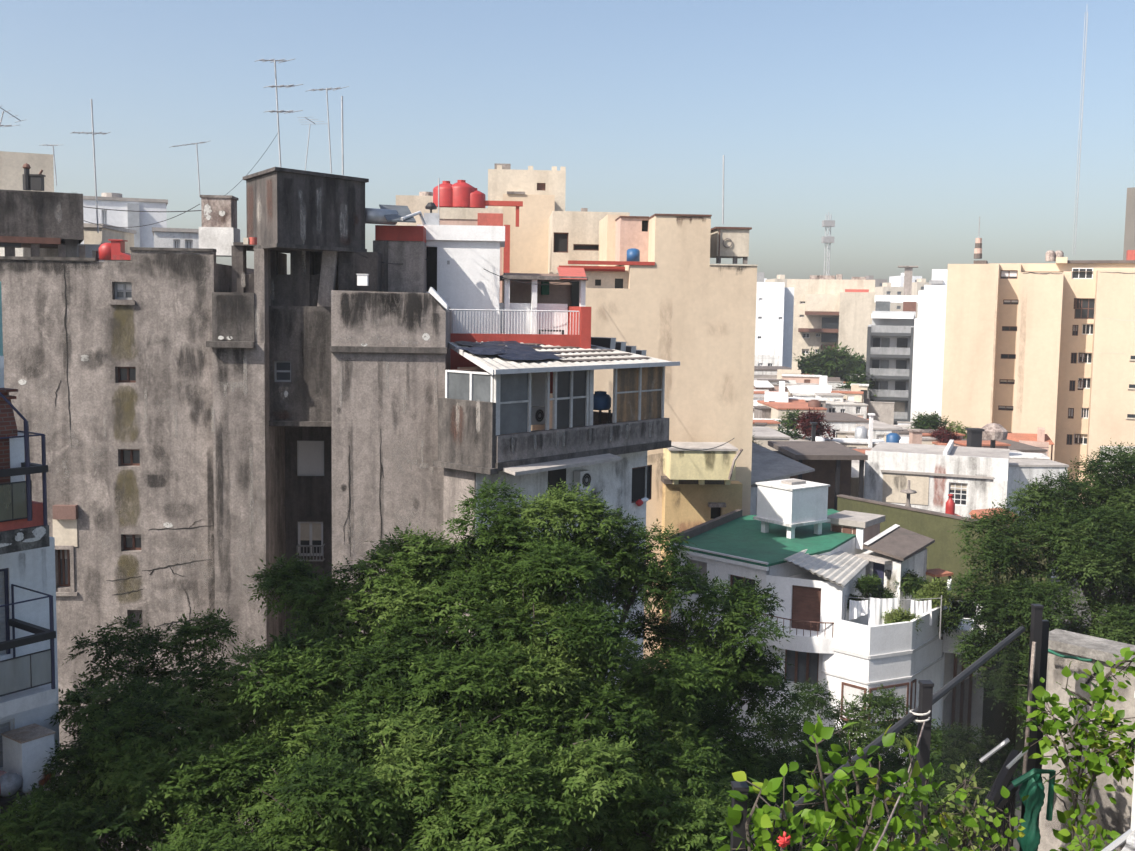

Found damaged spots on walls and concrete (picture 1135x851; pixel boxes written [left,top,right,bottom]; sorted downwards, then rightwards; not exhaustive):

leakage [284,179,356,237]
leakage [342,292,439,333]
crack [55,265,72,448]
leakage [104,389,147,440]
leakage [116,470,165,524]
peeling [0,526,46,547]